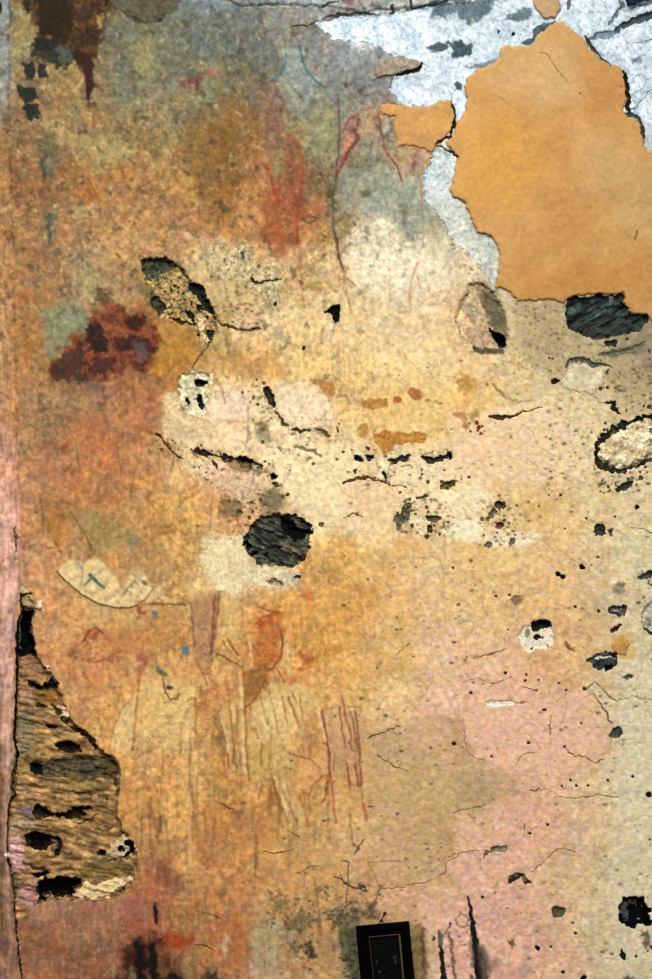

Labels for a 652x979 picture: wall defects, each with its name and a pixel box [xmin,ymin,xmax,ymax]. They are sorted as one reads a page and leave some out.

rust [23,0,181,99]
peeling [315,0,652,150]
spalling [138,242,285,346]
peeling [422,148,508,354]
flaking render [551,293,652,395]
flaking render [162,370,218,439]
flaking render [593,414,652,492]
flaking render [202,509,324,599]
spalling [507,618,554,653]
crack [4,578,33,979]
spalling [7,593,138,919]
water stain [125,937,182,979]